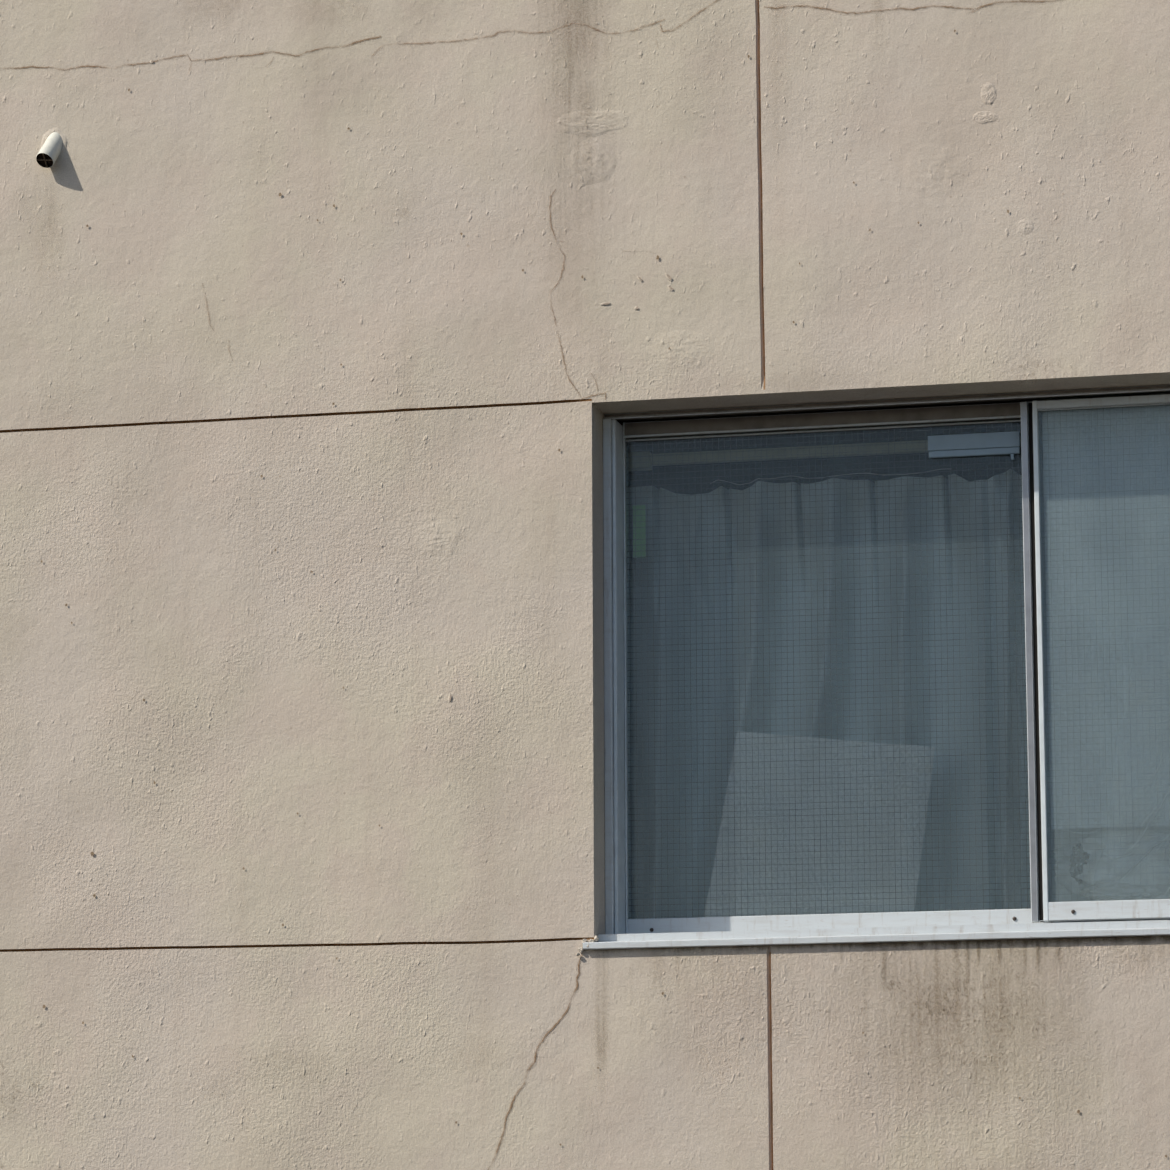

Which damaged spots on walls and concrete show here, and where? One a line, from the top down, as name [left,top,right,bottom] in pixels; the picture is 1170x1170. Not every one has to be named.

crack [769,0,1044,14]
crack [14,48,322,70]
crack [496,954,582,1153]